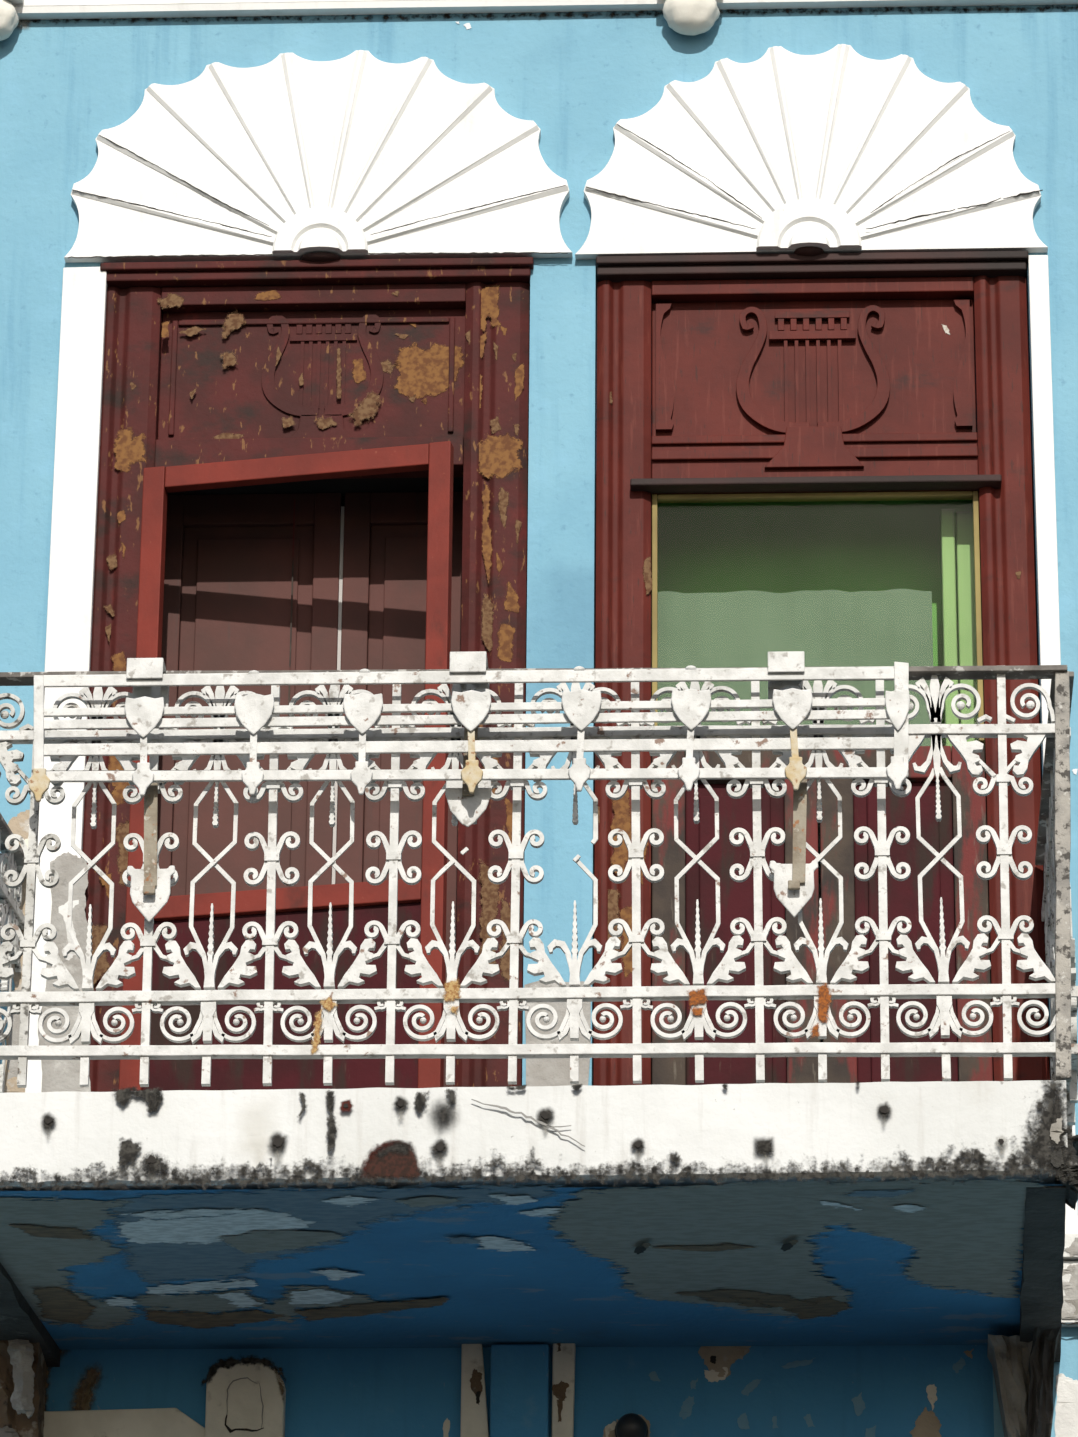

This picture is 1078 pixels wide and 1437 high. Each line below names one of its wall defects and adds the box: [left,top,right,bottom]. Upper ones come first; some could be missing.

peeling [255,290,281,301]
peeling [157,293,246,369]
peeling [113,427,147,472]
peeling [316,284,525,662]
corrosion [311,997,337,1054]
corrosion [443,979,460,1014]
corrosion [688,989,707,1016]
corrosion [811,983,831,1037]
leakage [0,1073,1075,1190]
peeling [0,1116,1078,1329]
spalling [0,1339,35,1437]
peeling [1055,1373,1078,1437]